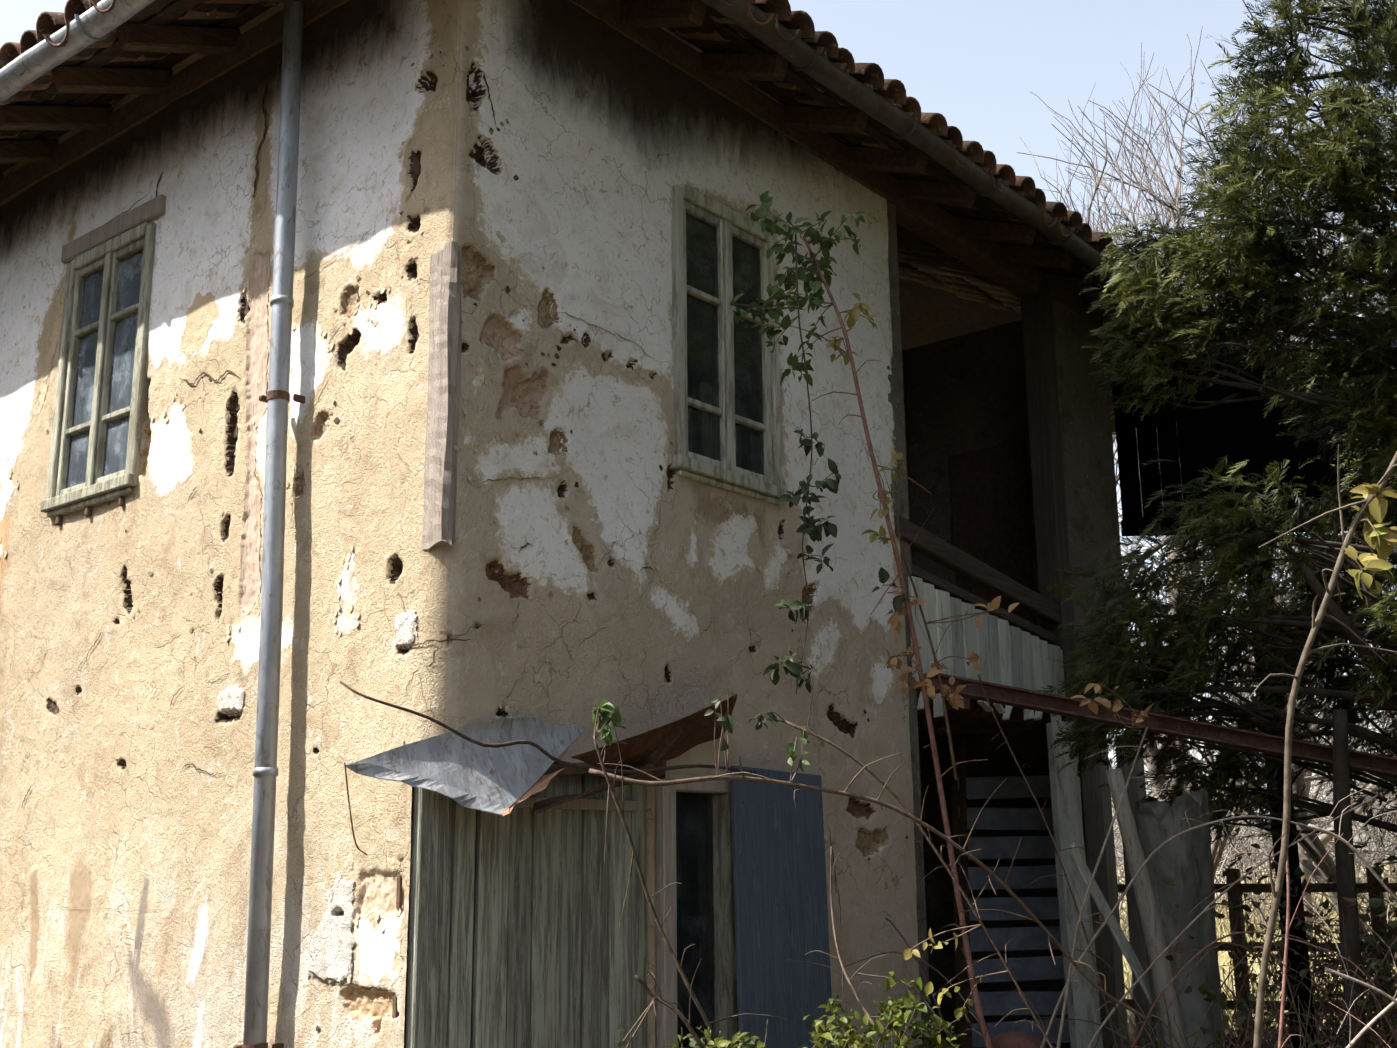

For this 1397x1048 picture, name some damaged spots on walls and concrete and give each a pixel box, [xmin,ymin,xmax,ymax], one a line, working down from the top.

peeling [288,0,444,441]
peeling [0,84,281,558]
crack [179,368,240,392]
peeling [454,0,899,738]
spalling [113,530,139,625]
spalling [389,554,403,584]
peeling [209,568,261,723]
peeling [281,610,300,659]
flaking render [394,610,417,655]
crack [405,638,471,694]
spalling [46,698,59,714]
crack [307,970,393,998]